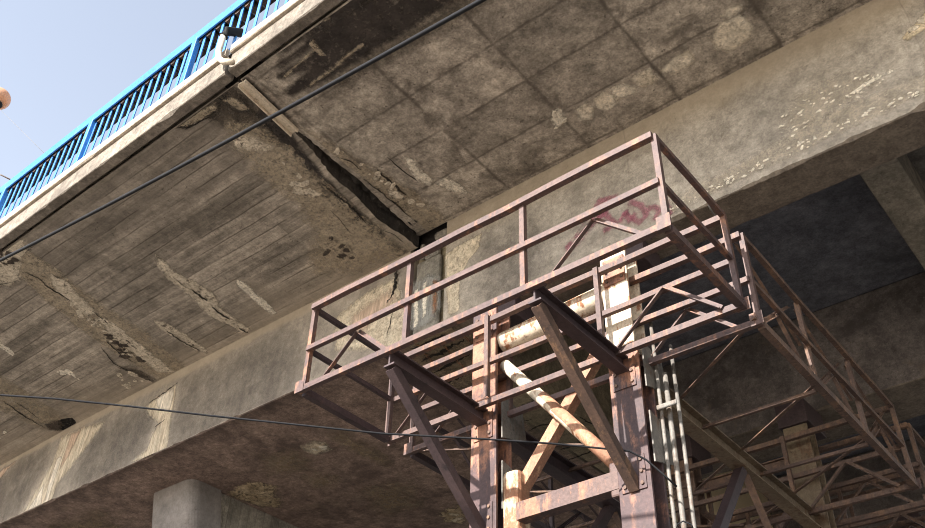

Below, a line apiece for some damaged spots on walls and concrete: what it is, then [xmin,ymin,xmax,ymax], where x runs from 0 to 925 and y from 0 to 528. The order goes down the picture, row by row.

water stain [277,0,487,96]
spalling [903,13,925,40]
water stain [202,78,410,275]
spalling [308,131,467,231]
spalling [670,72,925,213]
spalling [0,239,28,286]
crack [387,270,399,332]